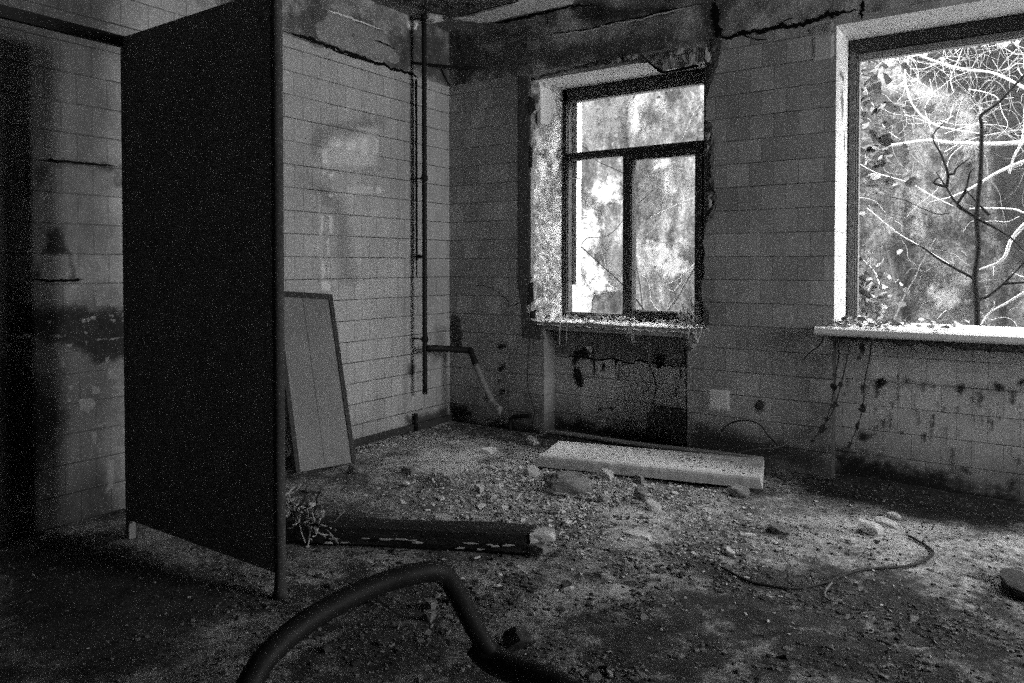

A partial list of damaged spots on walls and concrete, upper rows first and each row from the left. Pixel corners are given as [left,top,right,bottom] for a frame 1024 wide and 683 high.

flaking render [314,9,399,64]
crack [492,0,865,40]
flaking render [518,54,688,447]
leakage [835,432,1018,502]